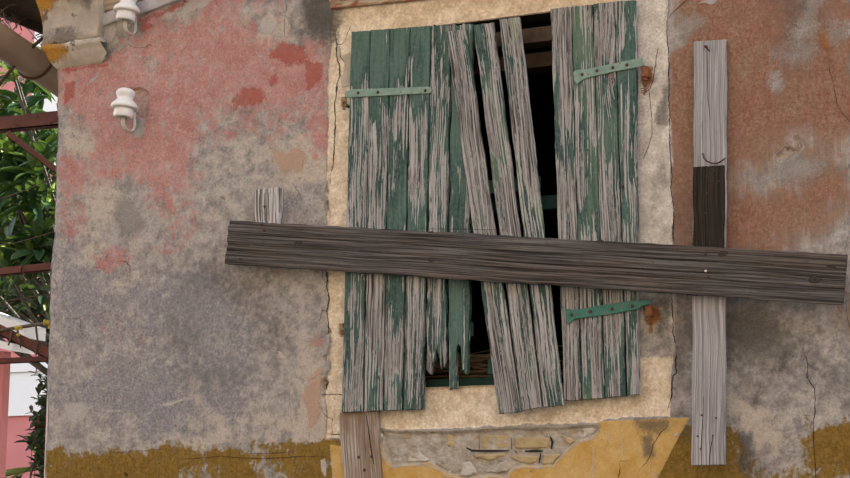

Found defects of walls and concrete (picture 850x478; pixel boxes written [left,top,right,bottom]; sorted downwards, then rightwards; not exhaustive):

peeling [180,0,212,21]
peeling [64,81,75,104]
flaking render [131,87,149,139]
peeling [305,61,323,91]
crack [331,24,351,171]
peeling [301,334,331,428]
flaking render [380,423,600,478]